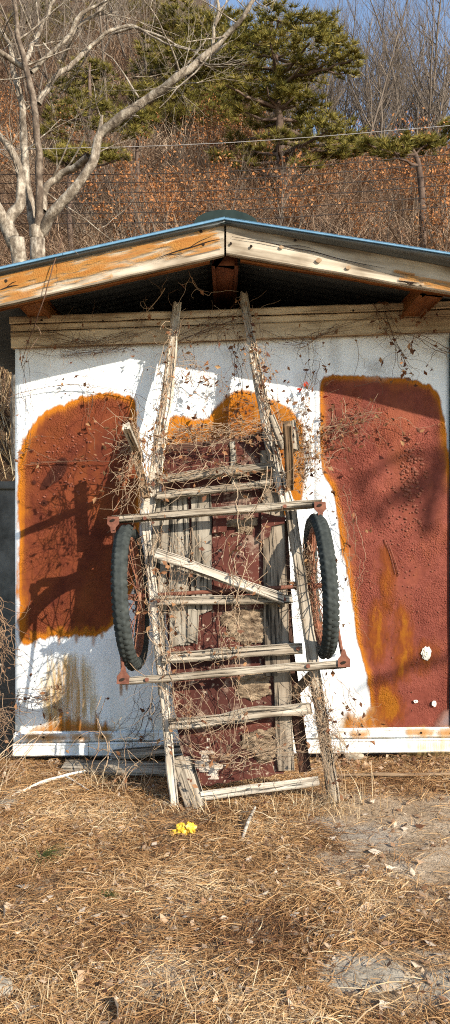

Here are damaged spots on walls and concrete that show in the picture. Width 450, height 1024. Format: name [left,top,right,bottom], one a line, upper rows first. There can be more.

corrosion [16,392,142,645]
corrosion [166,390,304,501]
corrosion [320,374,450,750]
corrosion [25,659,111,742]